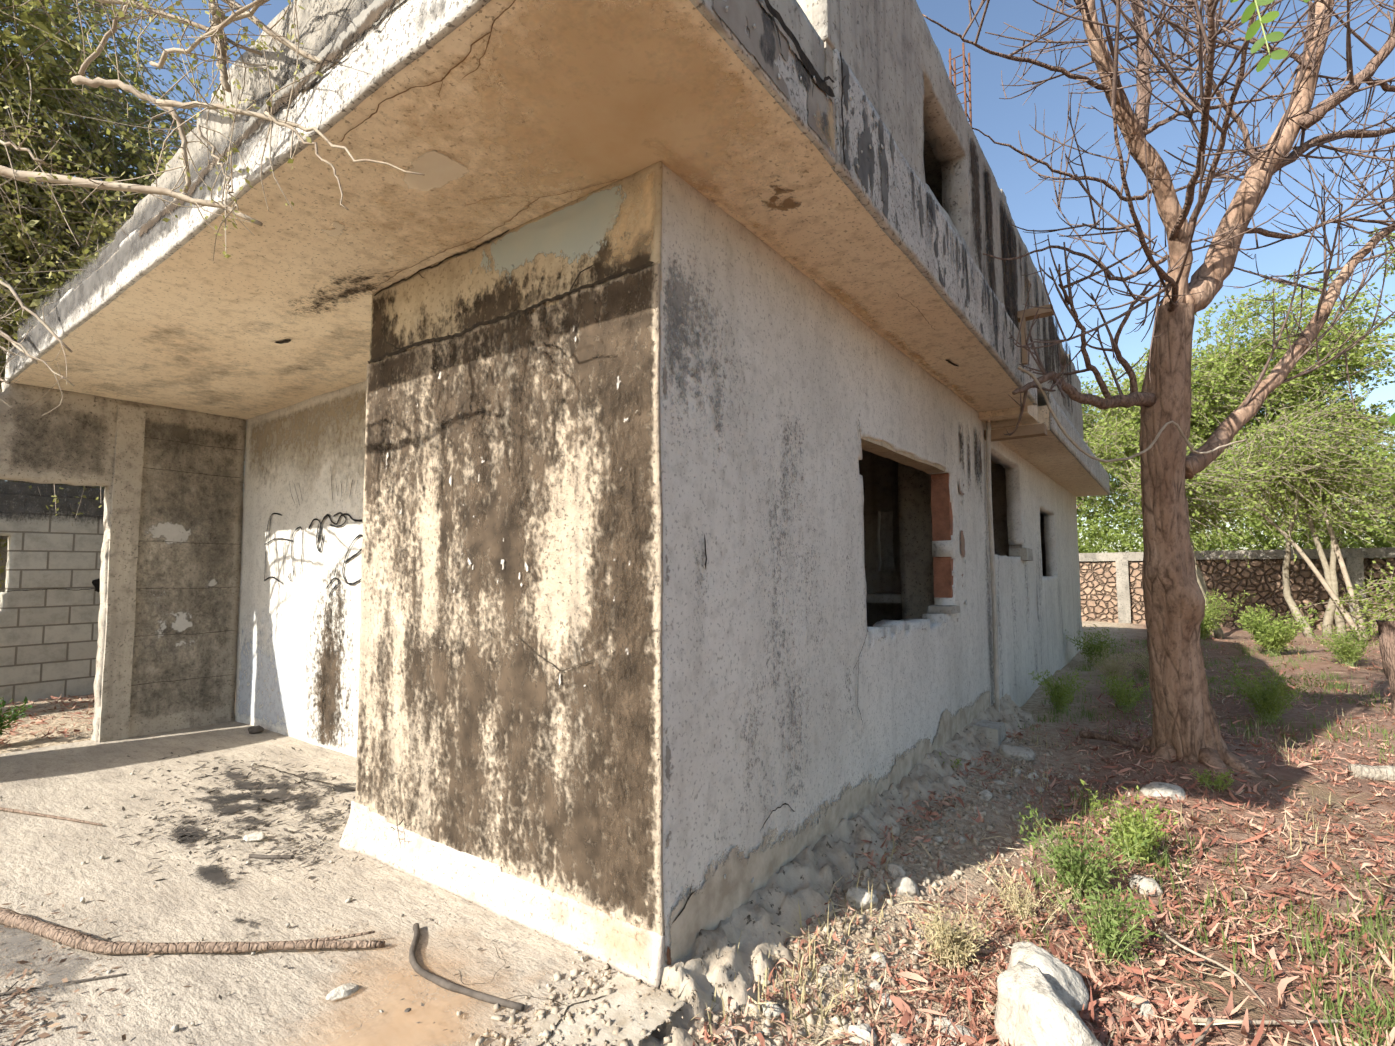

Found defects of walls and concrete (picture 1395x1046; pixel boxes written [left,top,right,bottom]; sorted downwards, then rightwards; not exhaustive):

crack [368,179,618,296]
peeling [470,185,627,284]
peeling [713,0,1014,360]
crack [368,261,654,364]
water stain [0,407,105,521]
water stain [132,222,744,928]
water stain [743,423,827,807]
spalling [665,730,673,787]
flaking render [670,689,991,964]